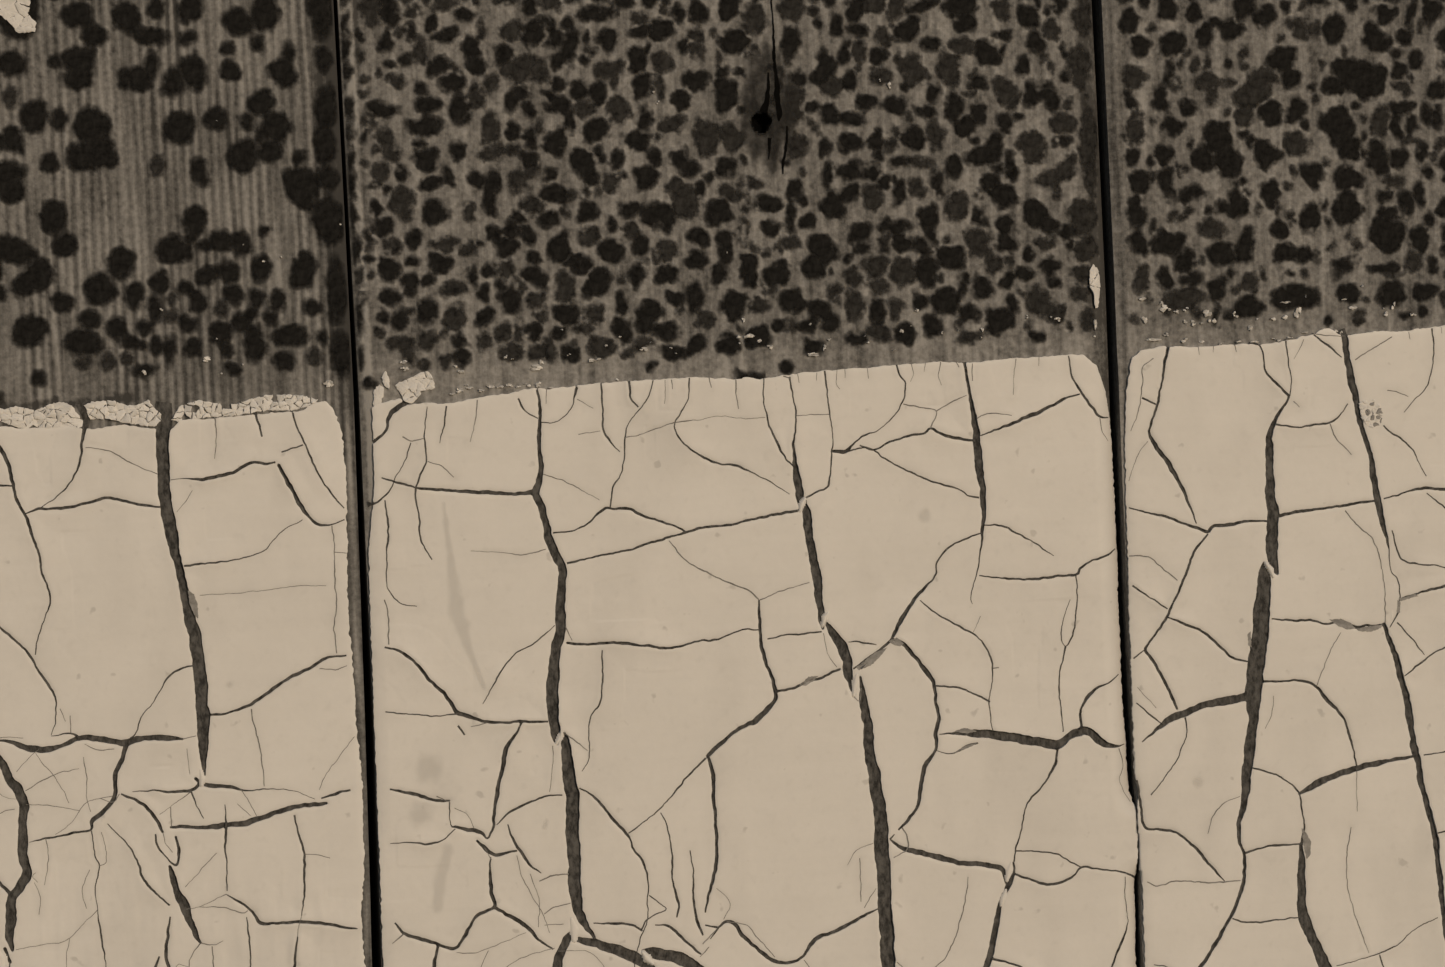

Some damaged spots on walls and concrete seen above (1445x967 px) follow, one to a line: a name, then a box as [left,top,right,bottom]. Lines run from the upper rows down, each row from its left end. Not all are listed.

peeling [0,0,36,33]
damp [0,0,1098,389]
damp [1118,0,1445,327]
peeling [1089,264,1100,337]
peeling [1139,296,1306,345]
peeling [0,380,334,429]
peeling [373,360,553,406]
crack [0,325,1445,967]